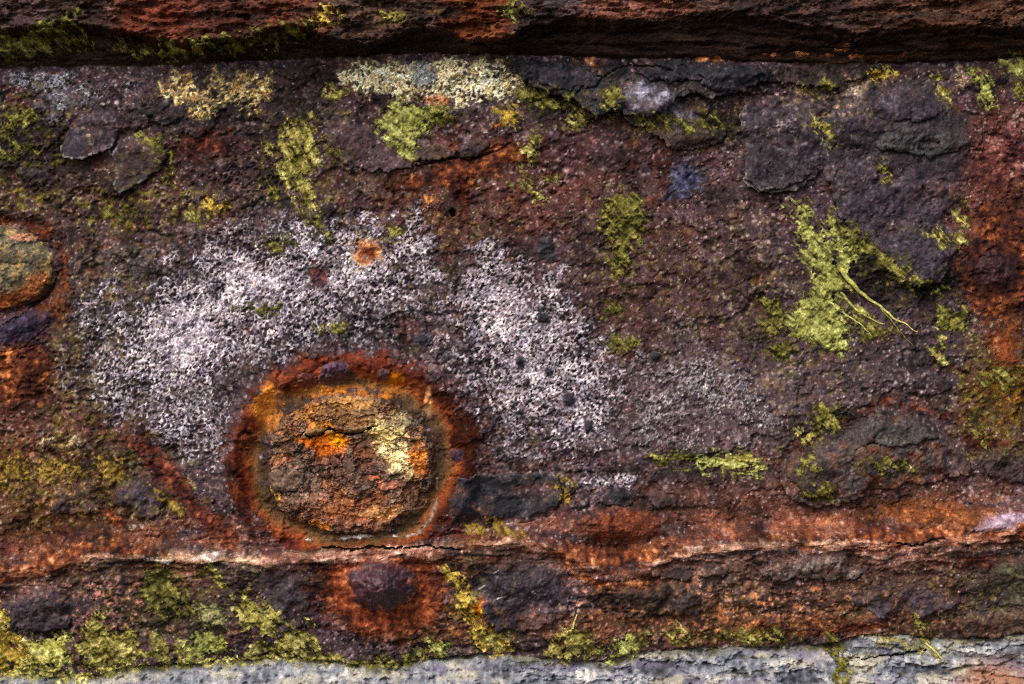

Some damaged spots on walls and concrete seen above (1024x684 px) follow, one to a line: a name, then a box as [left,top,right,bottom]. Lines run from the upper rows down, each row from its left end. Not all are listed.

rust [123,345,497,644]
crack [314,544,461,552]
rust [519,532,727,589]
rust [742,493,1024,573]